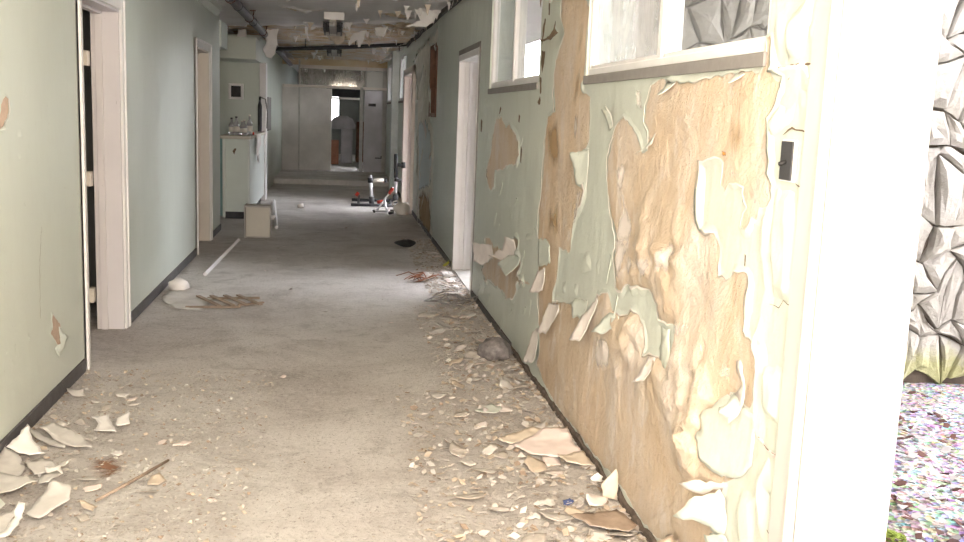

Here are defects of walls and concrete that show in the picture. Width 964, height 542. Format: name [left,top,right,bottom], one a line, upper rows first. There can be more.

peeling [0,93,10,133]
peeling [225,0,451,240]
peeling [49,312,68,358]
peeling [473,0,786,542]